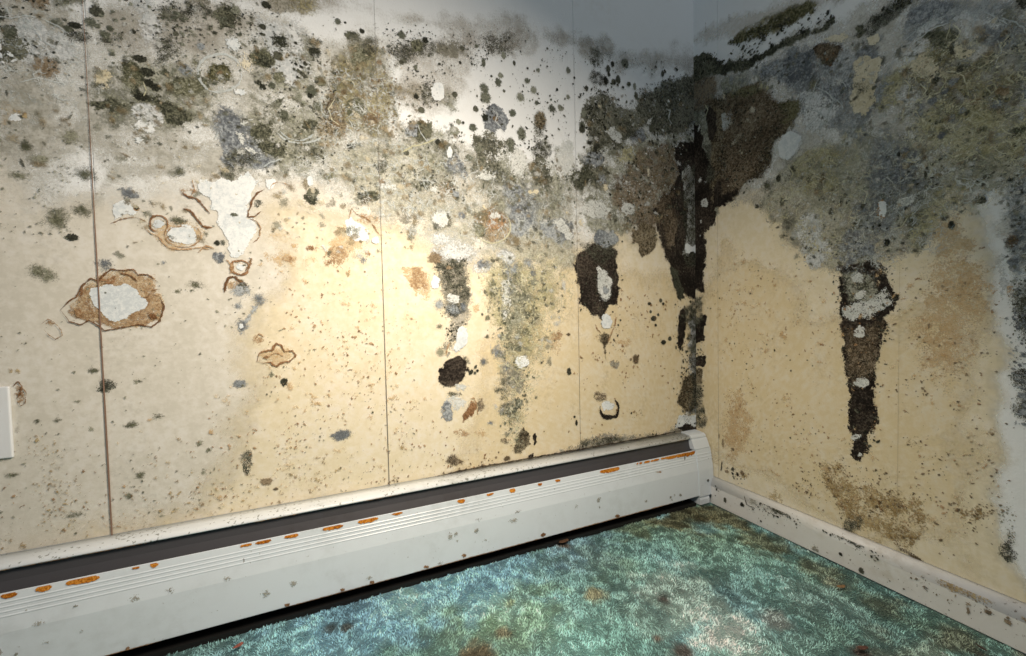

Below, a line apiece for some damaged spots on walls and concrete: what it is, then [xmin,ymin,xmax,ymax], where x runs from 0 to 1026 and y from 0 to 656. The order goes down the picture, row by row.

damp [256,0,318,17]
damp [582,38,636,94]
damp [58,164,96,181]
peeling [197,171,287,264]
damp [1008,346,1026,426]
rust [637,440,695,473]
damp [740,497,800,528]
rust [66,575,100,585]